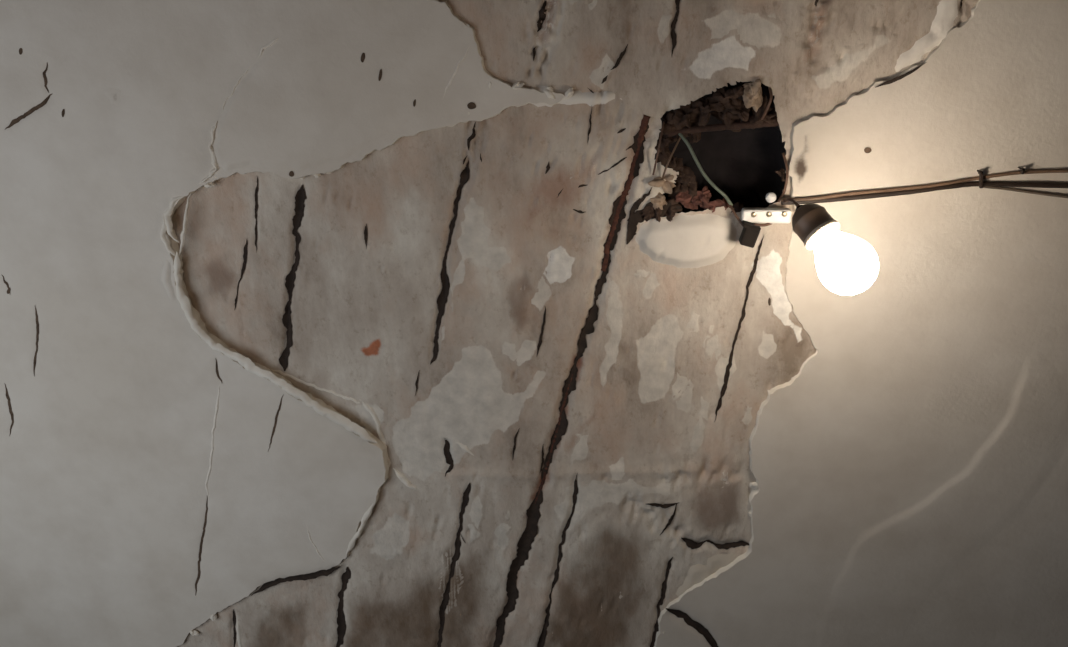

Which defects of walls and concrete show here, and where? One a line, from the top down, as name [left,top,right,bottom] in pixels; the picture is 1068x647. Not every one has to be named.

crack [5,64,52,129]
crack [268,185,306,450]
corrosion [353,336,384,362]
crack [415,122,482,395]
spalling [160,0,981,647]
crack [493,125,649,647]
corrosion [513,110,662,256]
crack [671,0,680,55]
crack [715,236,764,420]
crack [233,566,351,647]
crack [437,440,470,647]
crack [647,503,749,647]